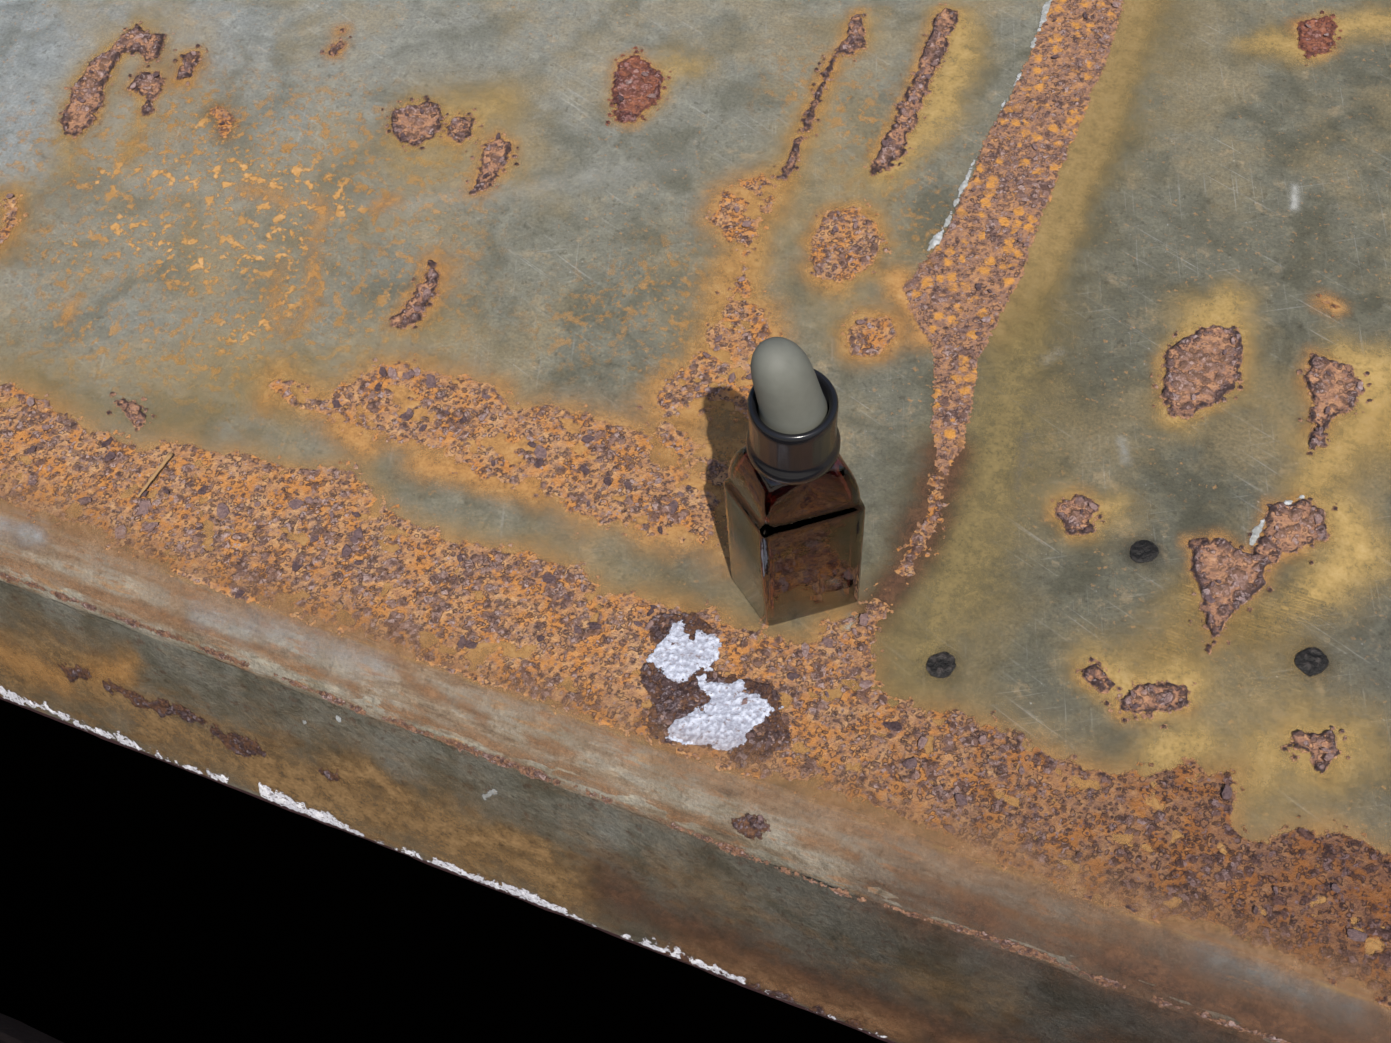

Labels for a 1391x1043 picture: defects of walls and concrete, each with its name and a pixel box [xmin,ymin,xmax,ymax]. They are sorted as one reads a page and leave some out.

corrosion [0,193,28,247]
corrosion [42,21,520,376]
corrosion [261,11,867,560]
corrosion [0,382,736,771]
corrosion [648,0,1391,1009]
corrosion [0,636,991,1043]
corrosion [1151,995,1291,1043]